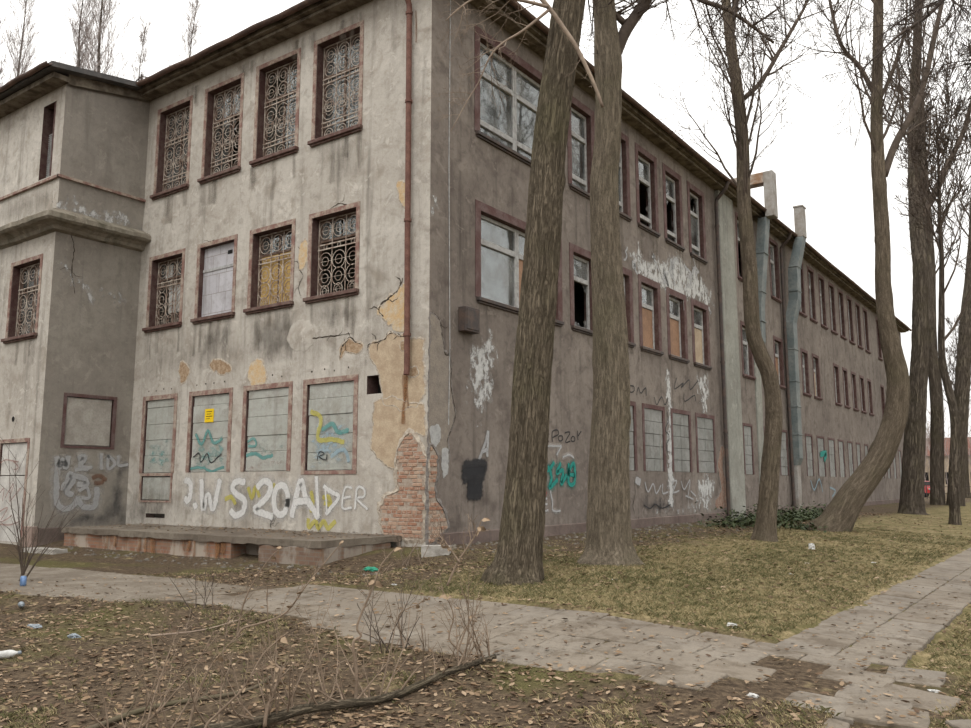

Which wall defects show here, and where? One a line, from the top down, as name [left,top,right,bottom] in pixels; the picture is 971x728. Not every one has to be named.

crack [60,235,81,293]
crack [313,277,404,359]
flaking render [209,358,232,376]
flaking render [247,358,268,391]
flaking render [339,283,456,545]
damp [665,370,679,514]
damp [697,373,709,413]
damp [693,474,714,510]